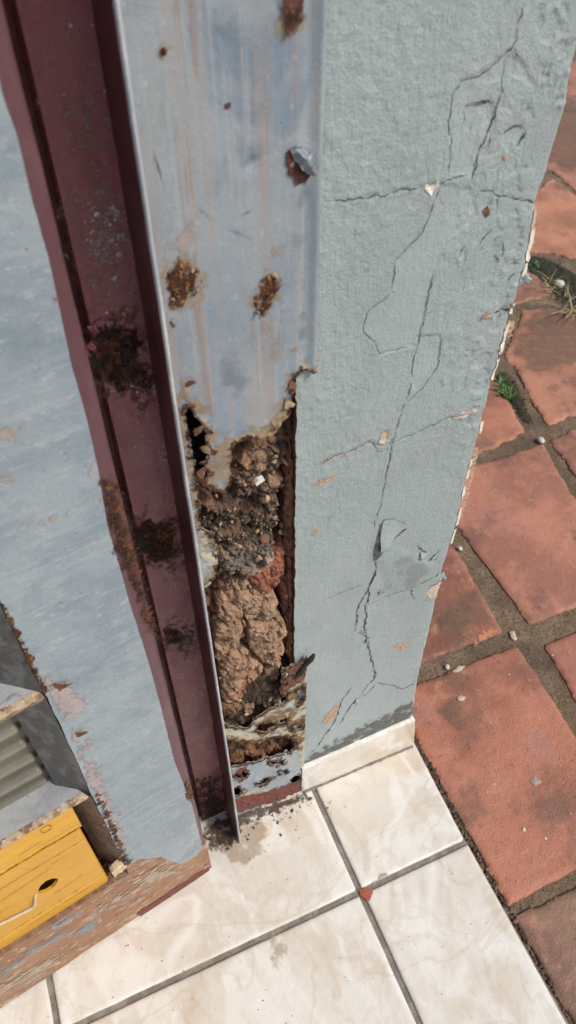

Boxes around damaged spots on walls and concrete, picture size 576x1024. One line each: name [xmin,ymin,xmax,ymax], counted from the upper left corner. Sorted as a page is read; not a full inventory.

rust [280,0,305,36]
crack [317,2,535,524]
rust [84,309,155,411]
rust [162,224,320,591]
peeling [44,676,128,850]
rust [86,463,199,655]
spalling [185,408,294,803]
rust [184,653,315,822]
crack [316,561,439,748]